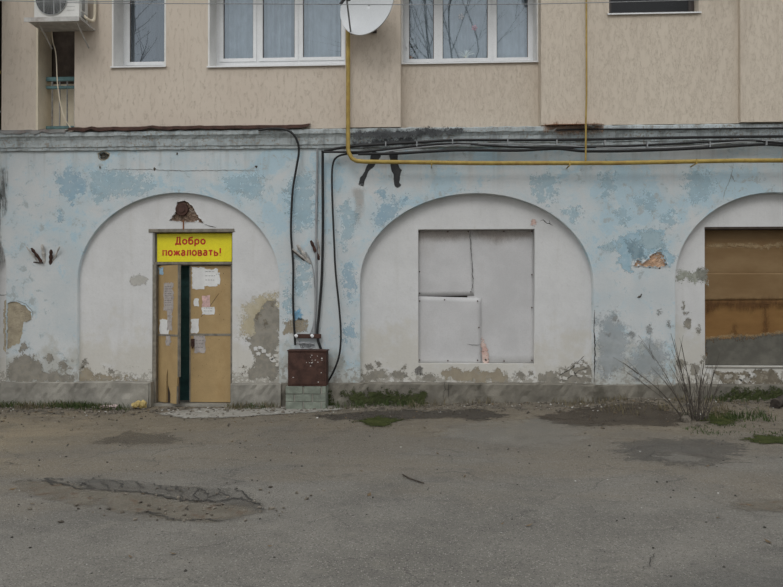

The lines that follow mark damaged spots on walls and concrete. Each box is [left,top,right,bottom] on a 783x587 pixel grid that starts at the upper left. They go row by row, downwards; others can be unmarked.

peeling [597,228,709,285]
peeling [3,300,137,382]
flaking render [241,293,309,382]
peeling [361,361,408,382]
flaking render [420,338,592,383]